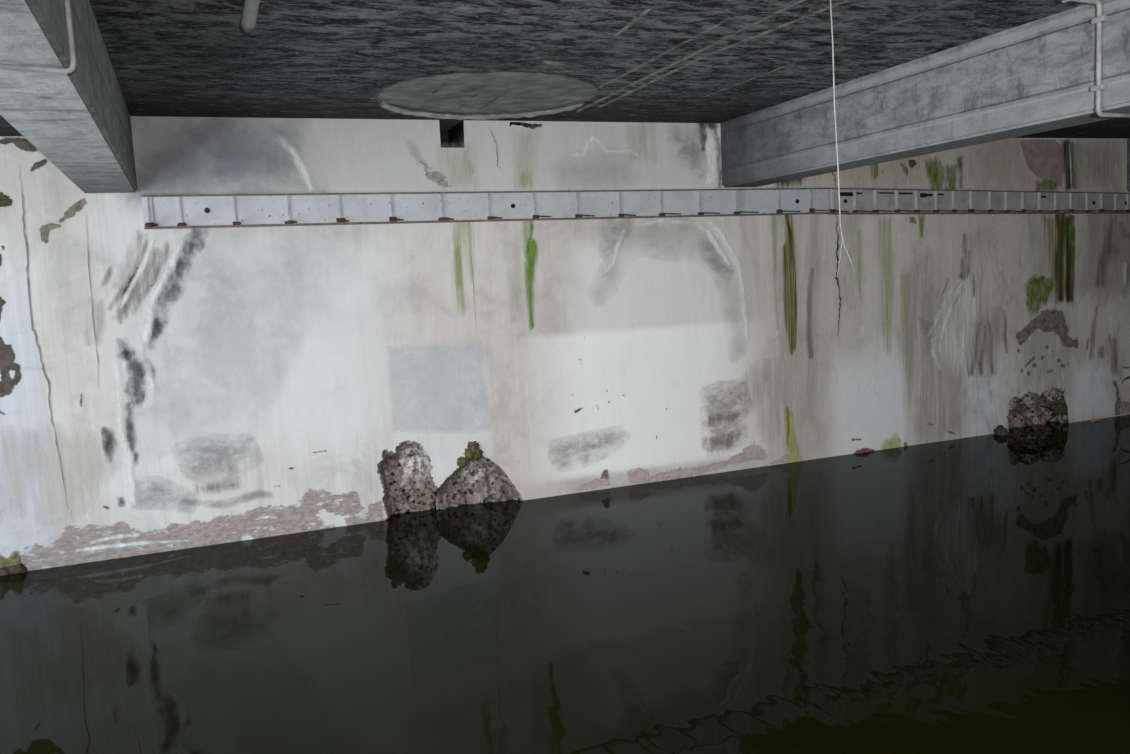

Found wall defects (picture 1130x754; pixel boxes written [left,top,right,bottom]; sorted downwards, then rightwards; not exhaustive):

spalling [1020,140,1064,187]
crack [834,216,842,335]
water stain [1027,214,1075,313]
water stain [8,231,199,508]
spalling [1007,308,1078,428]
peeling [19,440,523,571]